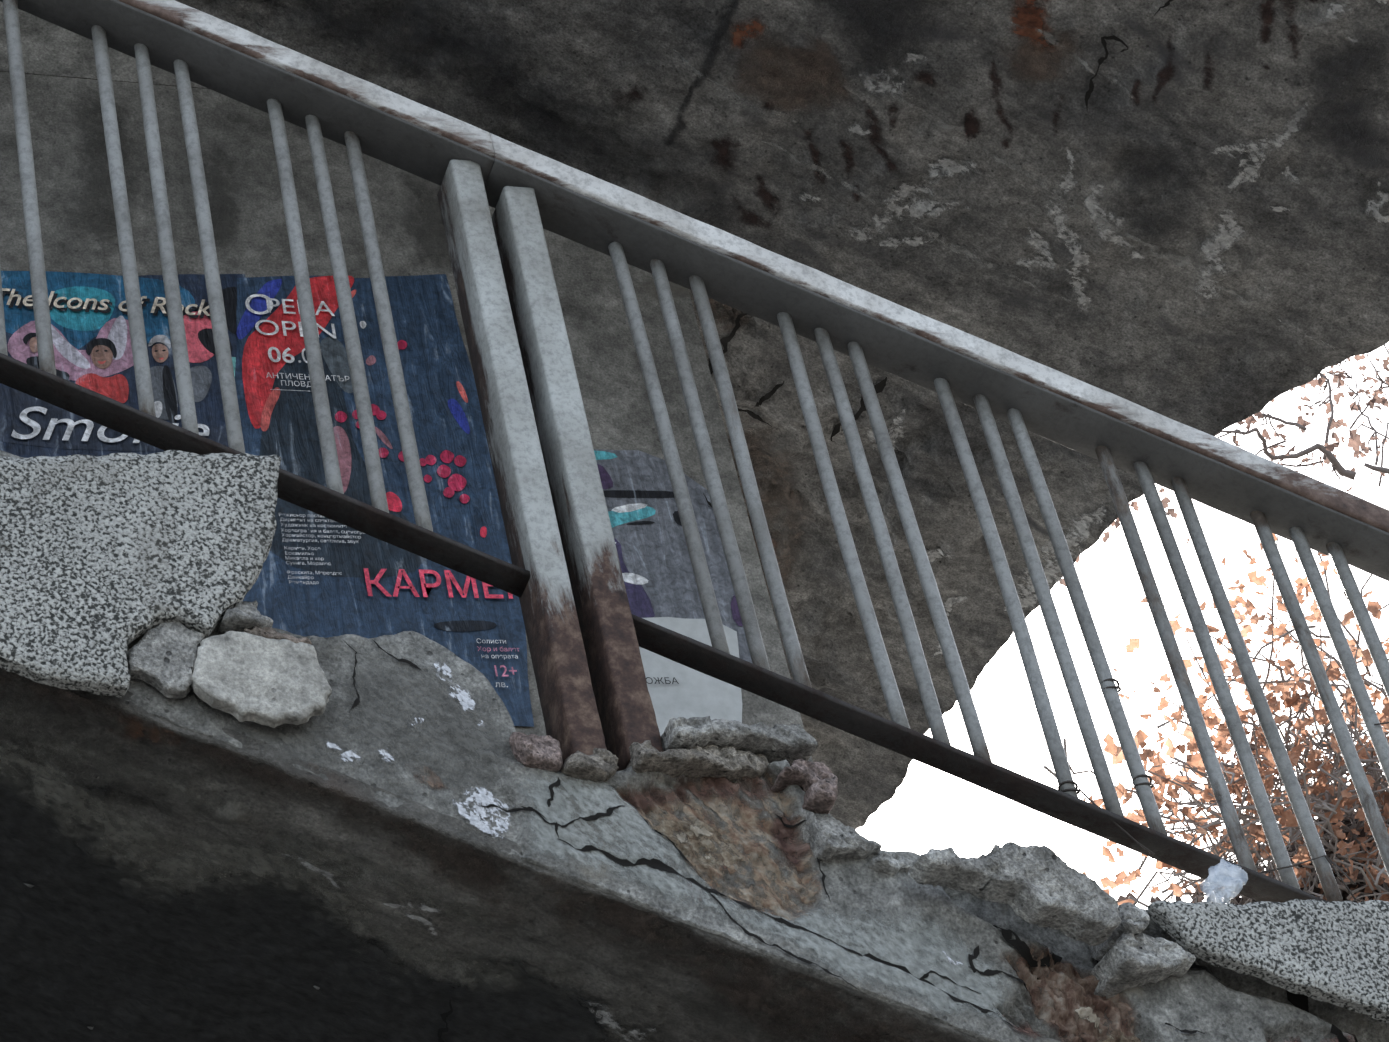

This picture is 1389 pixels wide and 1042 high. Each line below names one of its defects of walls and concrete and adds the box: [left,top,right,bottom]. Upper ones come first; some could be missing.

crack [666,0,740,144]
damp [0,741,653,1042]
peeling [327,742,360,762]
damp [188,663,501,799]
peeling [454,787,510,838]
spalling [651,819,744,869]
corrosion [618,772,821,923]
damp [527,778,1005,1019]
crack [481,777,1062,1030]
spalling [1075,1007,1141,1042]
crack [1165,1023,1205,1034]
crack [1286,990,1358,1042]